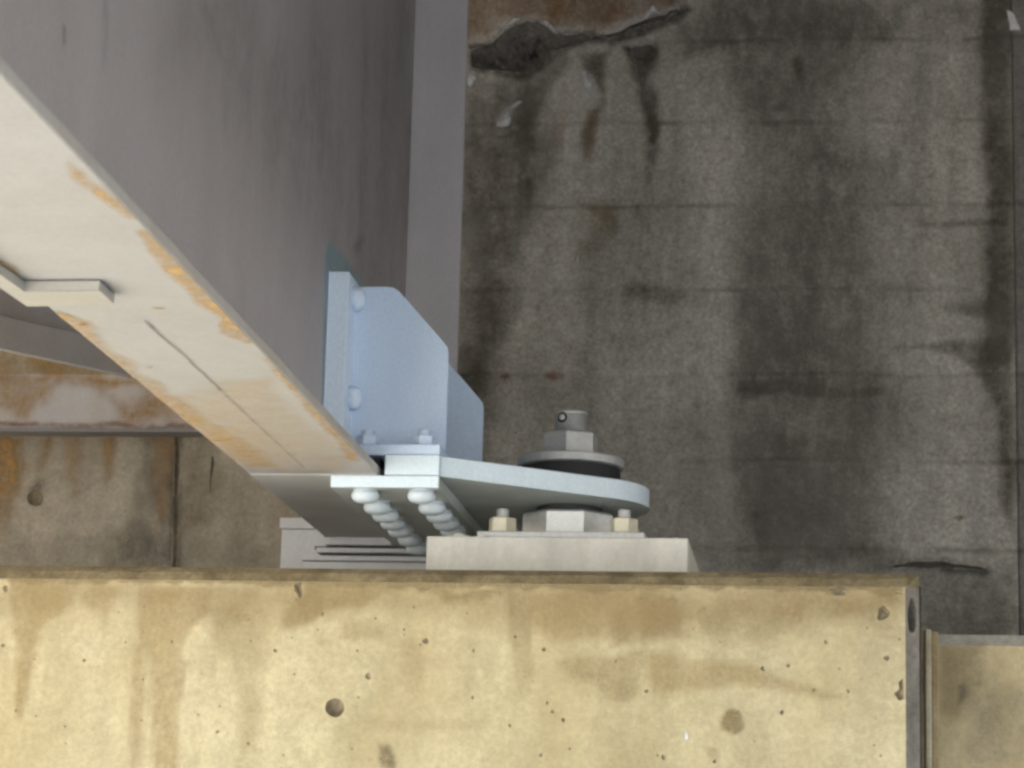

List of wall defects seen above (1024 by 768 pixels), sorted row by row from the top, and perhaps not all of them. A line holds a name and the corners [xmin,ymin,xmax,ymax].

spalling [467,18,594,88]
spalling [628,45,656,65]
damp [635,57,658,160]
rust [140,232,252,343]
damp [460,86,541,397]
damp [932,0,1014,510]
damp [4,578,830,596]
damp [722,710,741,734]